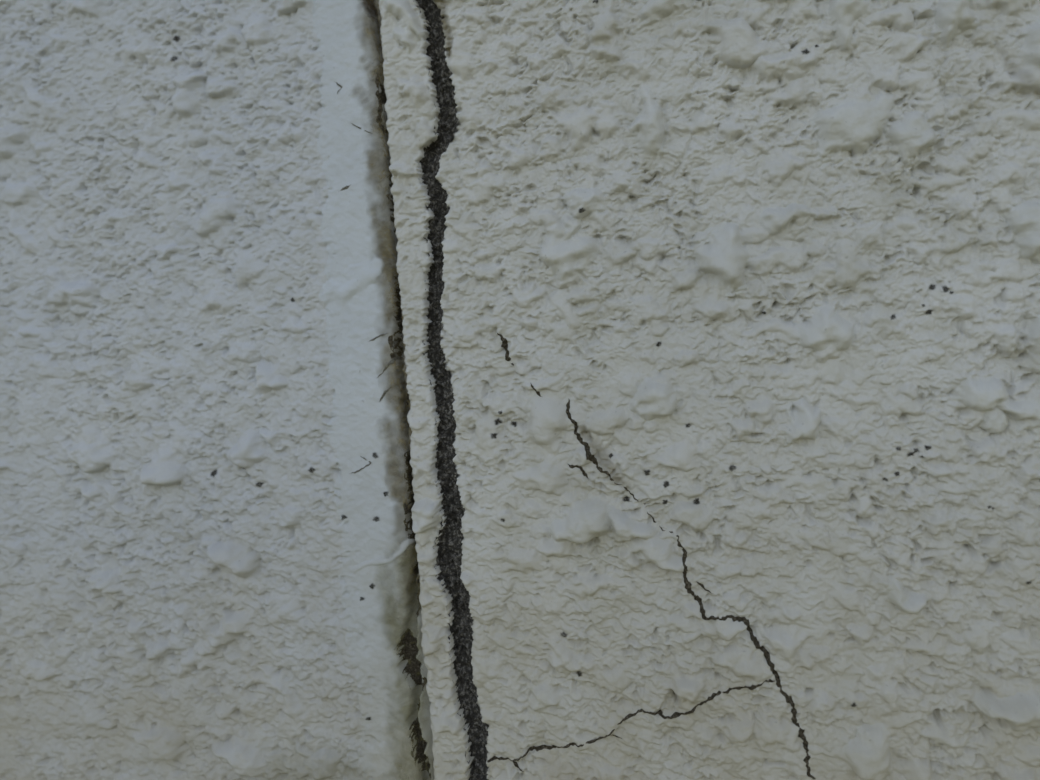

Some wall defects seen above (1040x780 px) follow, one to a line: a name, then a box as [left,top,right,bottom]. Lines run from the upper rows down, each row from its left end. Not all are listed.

crack [351,73,389,134]
crack [370,0,816,780]